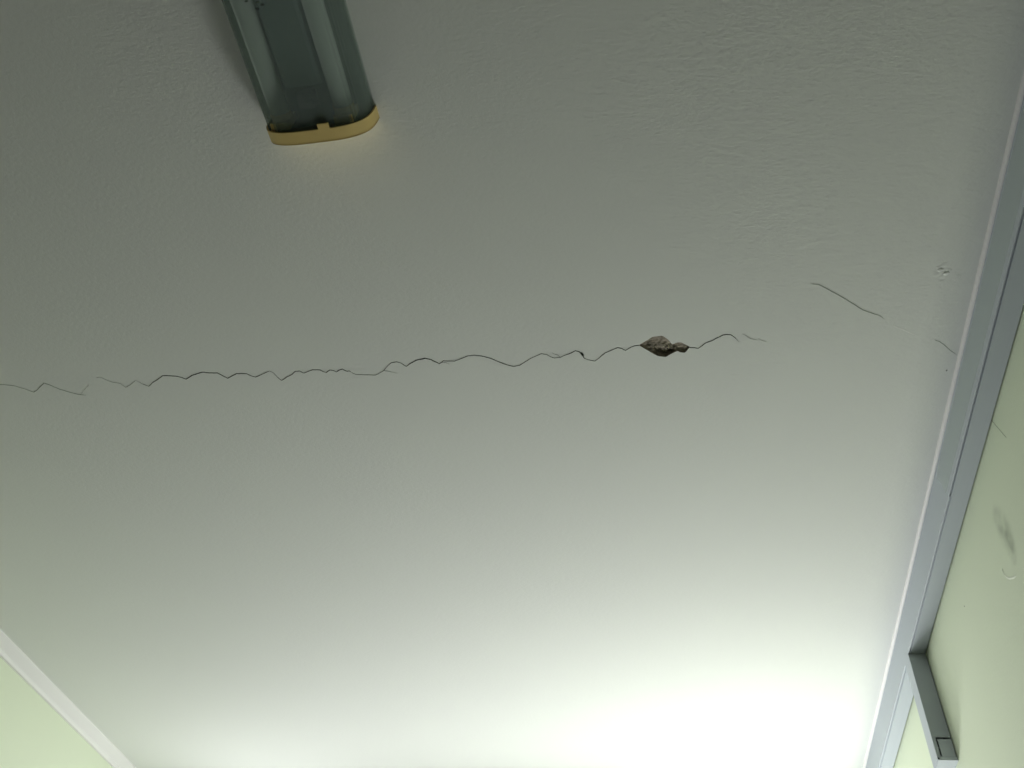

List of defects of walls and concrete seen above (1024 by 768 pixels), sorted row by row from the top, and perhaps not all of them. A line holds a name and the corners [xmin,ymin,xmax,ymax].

crack [0,345,639,395]
flaking render [639,336,690,357]